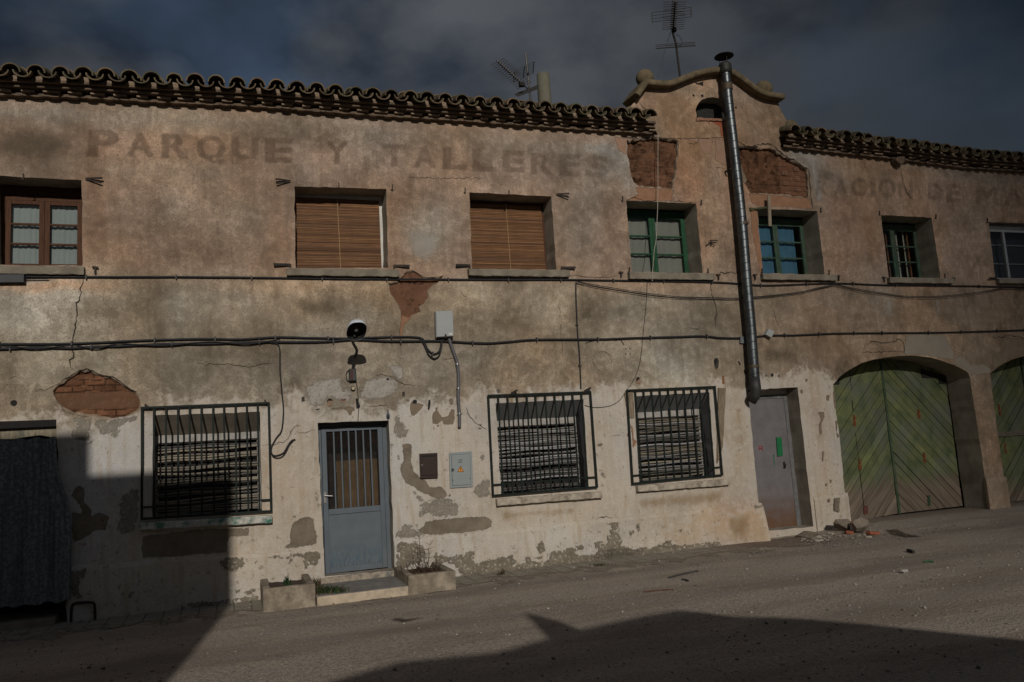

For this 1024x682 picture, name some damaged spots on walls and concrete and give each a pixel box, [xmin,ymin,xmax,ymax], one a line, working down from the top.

flaking render [615,118,811,273]
crack [11,279,137,392]
flaking render [389,272,441,336]
flaking render [54,372,140,442]
peeling [306,365,404,417]
peeling [72,486,110,541]
peeling [142,528,257,571]
peeling [273,516,320,568]
peeling [390,399,721,576]